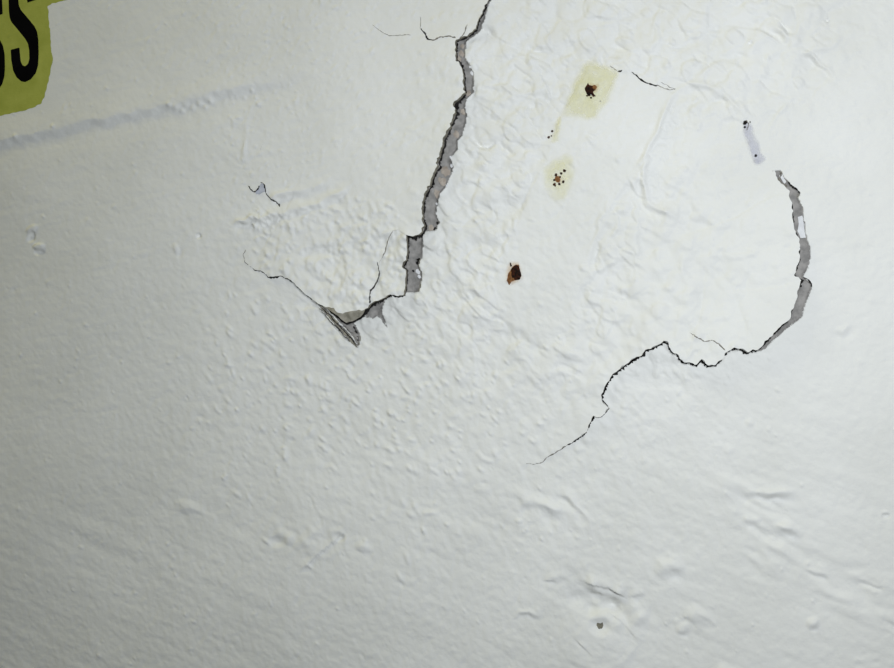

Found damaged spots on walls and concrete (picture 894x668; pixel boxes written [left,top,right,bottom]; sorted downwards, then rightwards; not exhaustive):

corrosion [572,73,607,114]
crack [610,66,676,90]
crack [243,0,491,348]
corrosion [507,263,521,285]
crack [527,171,812,465]